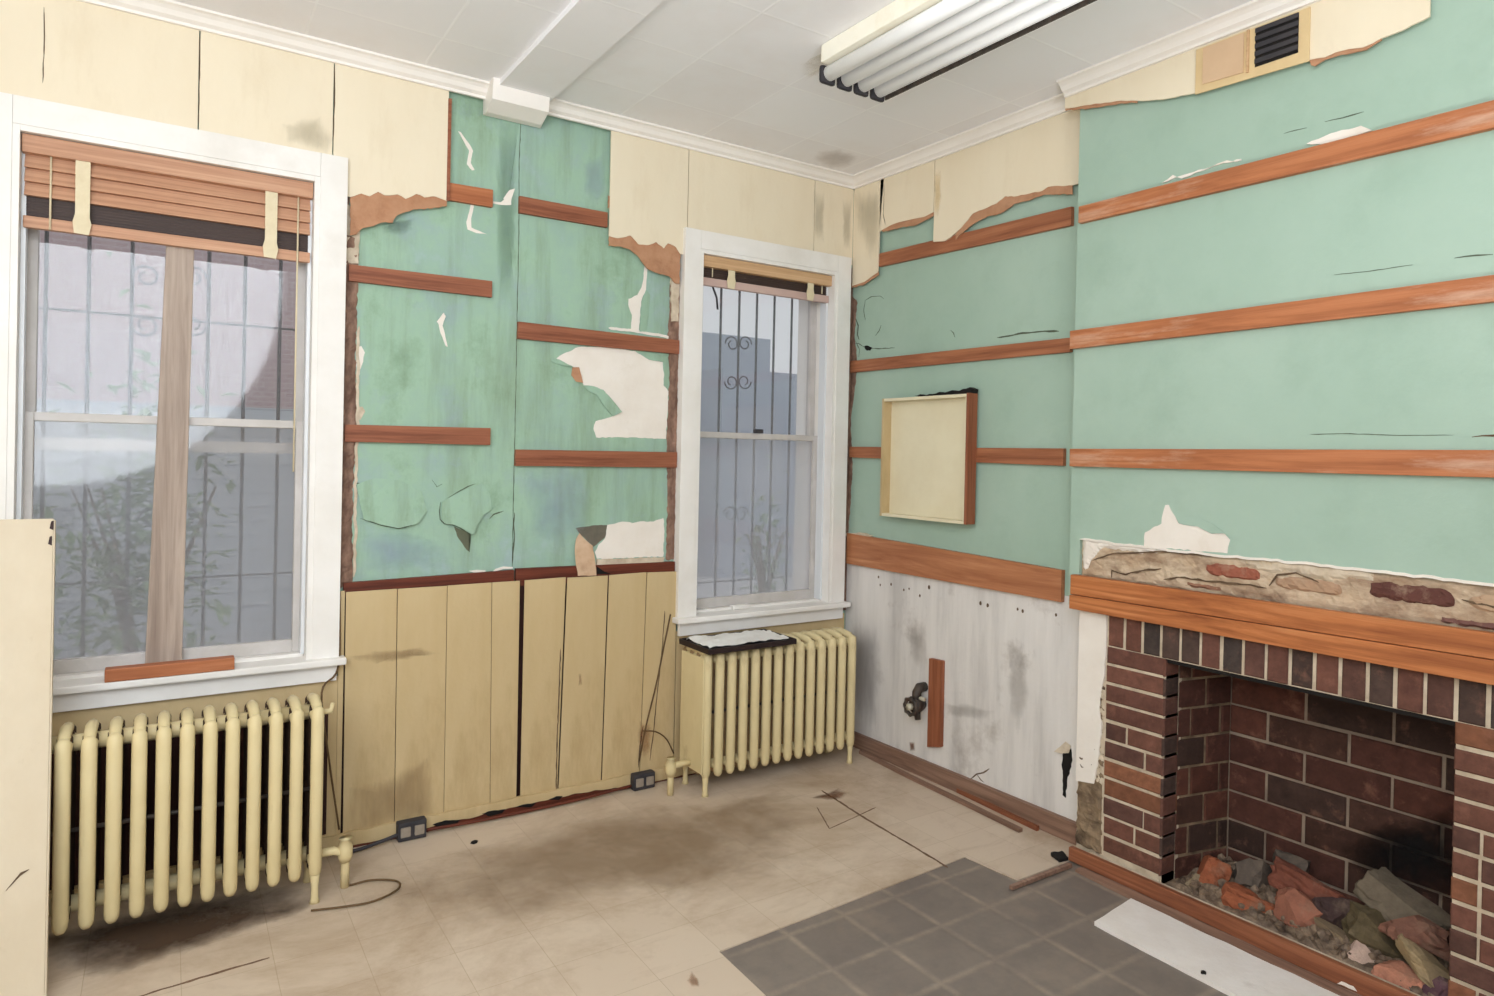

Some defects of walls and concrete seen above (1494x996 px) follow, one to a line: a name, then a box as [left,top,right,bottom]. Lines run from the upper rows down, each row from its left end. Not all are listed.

peeling [458,131,474,170]
peeling [493,189,515,205]
peeling [466,205,485,234]
peeling [437,313,448,347]
spalling [340,197,365,588]
peeling [551,266,680,576]
flaking render [1080,505,1494,632]